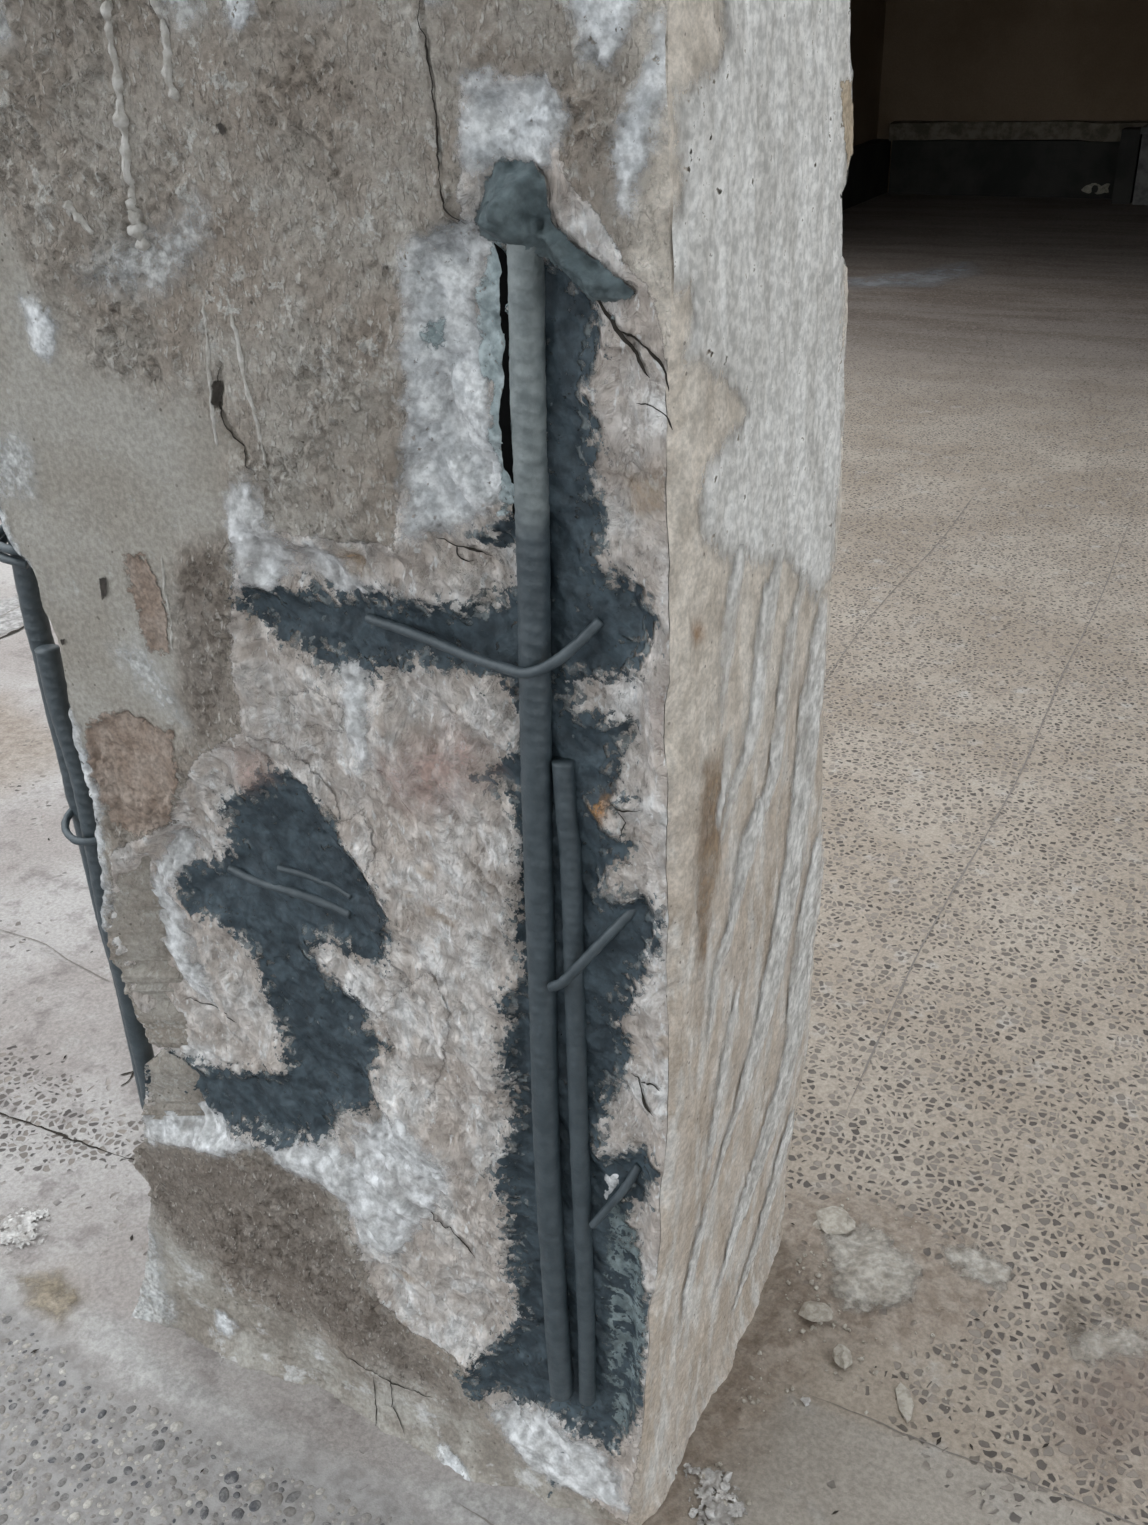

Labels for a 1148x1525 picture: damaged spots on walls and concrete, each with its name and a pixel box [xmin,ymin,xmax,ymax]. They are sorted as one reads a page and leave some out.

crack [0,606,24,639]
spalling [0,73,669,1524]
crack [597,293,673,430]
peeling [672,0,854,1325]